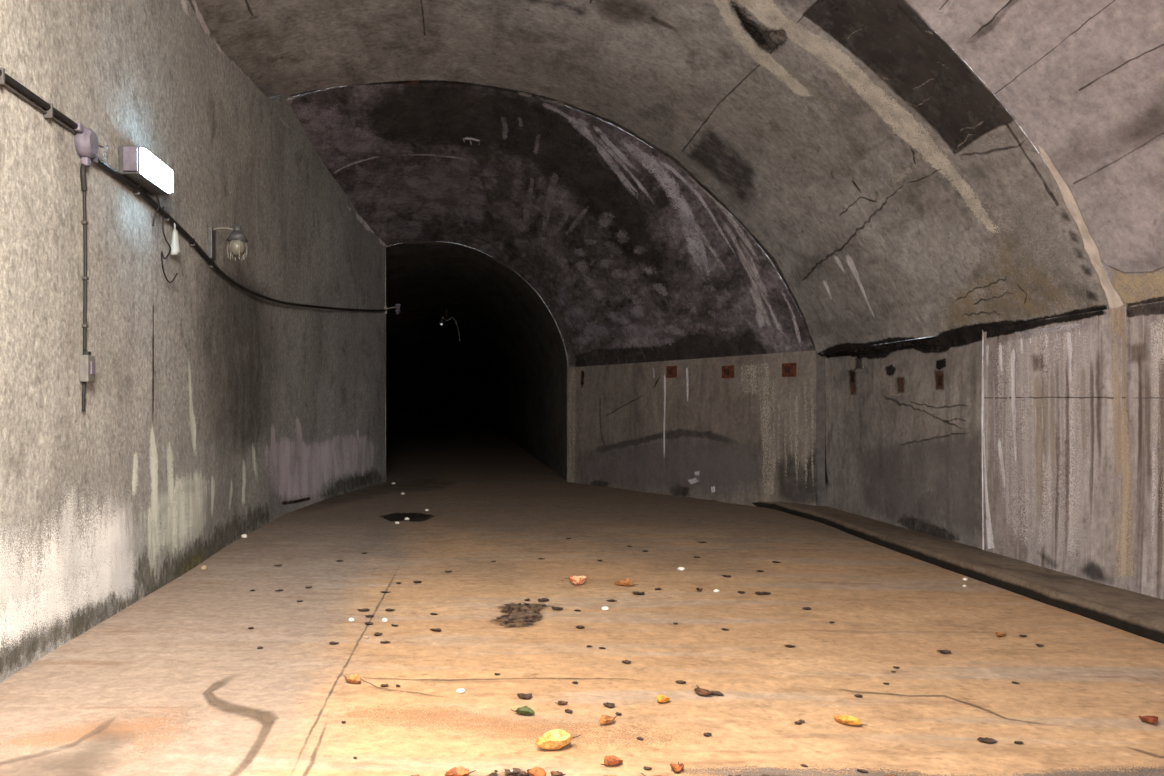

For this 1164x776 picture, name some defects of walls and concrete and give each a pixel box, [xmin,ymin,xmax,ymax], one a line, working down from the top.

spalling [730,0,787,53]
damp [543,103,801,349]
damp [714,0,1164,577]
damp [0,281,446,681]
damp [0,703,197,776]
damp [203,681,276,775]